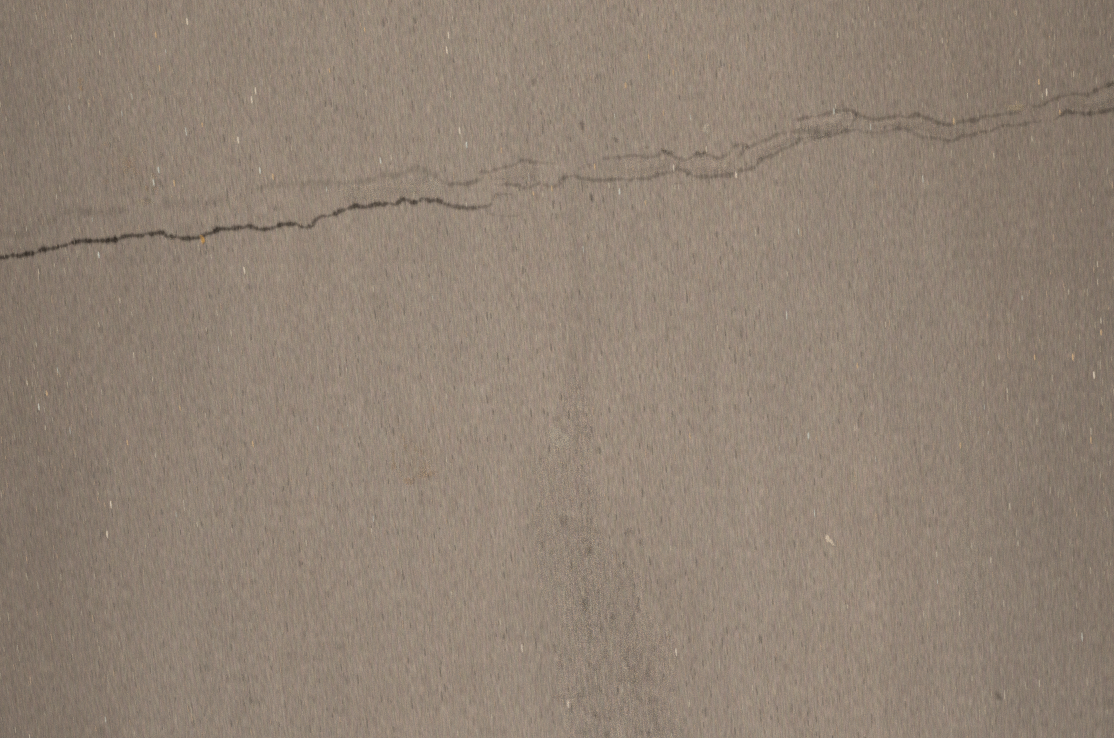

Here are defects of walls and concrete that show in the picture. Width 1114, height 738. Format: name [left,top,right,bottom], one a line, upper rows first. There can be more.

crack [807,116,841,127]
crack [695,160,727,169]
crack [0,198,442,259]